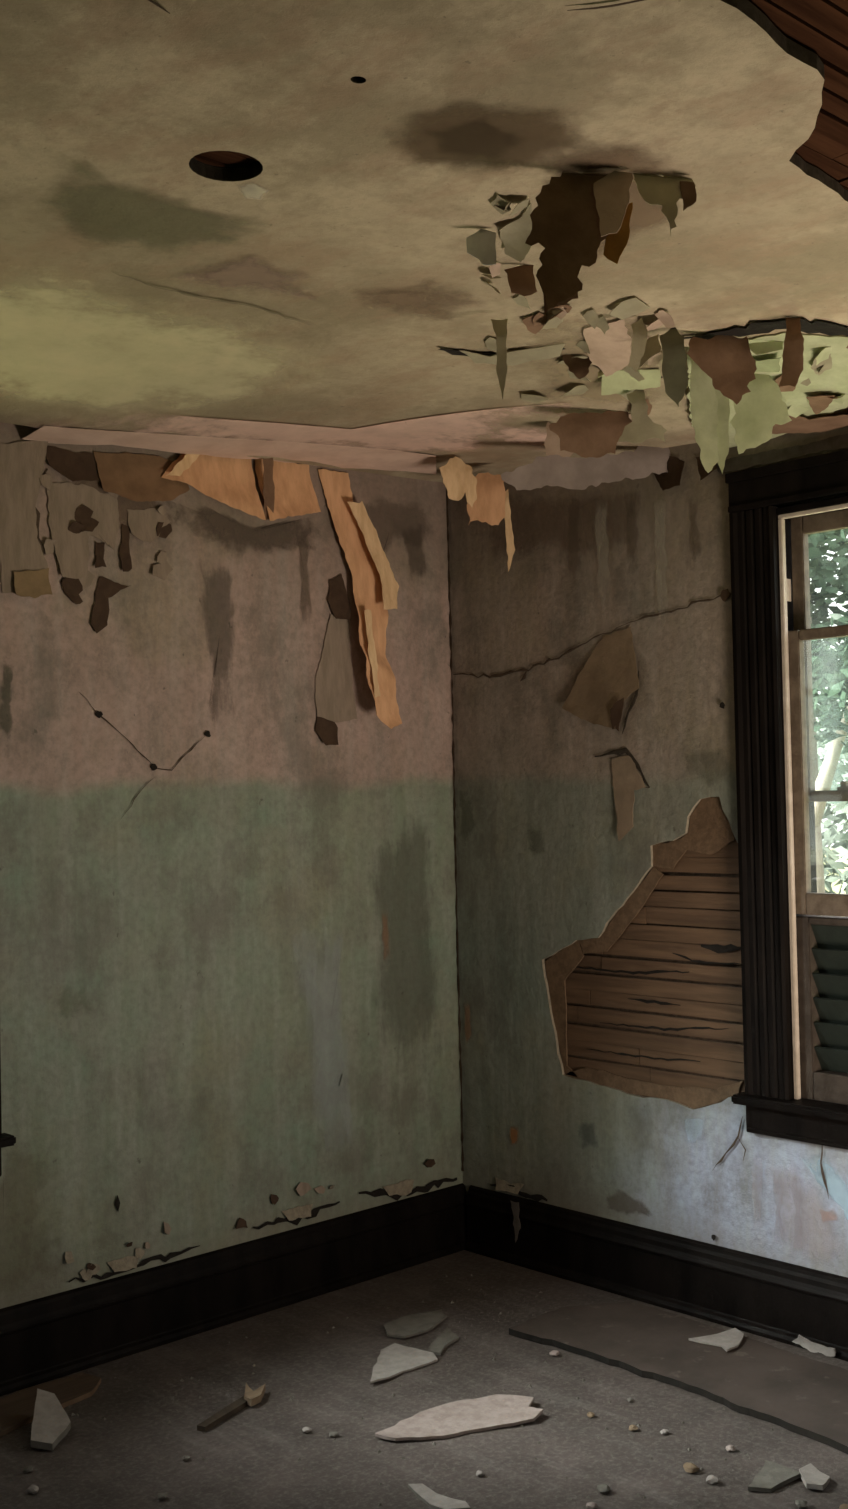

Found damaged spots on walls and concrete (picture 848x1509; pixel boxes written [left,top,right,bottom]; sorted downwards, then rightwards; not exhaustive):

damp [61,169,240,244]
damp [407,107,667,234]
peeling [481,263,675,420]
peeling [686,333,848,475]
peeling [43,505,112,599]
peeling [318,469,402,729]
crack [446,488,720,1171]
spalling [545,797,745,1109]
spalling [65,1222,200,1283]
spalling [236,1182,340,1230]
spalling [359,1159,457,1201]
crack [820,1145,829,1199]